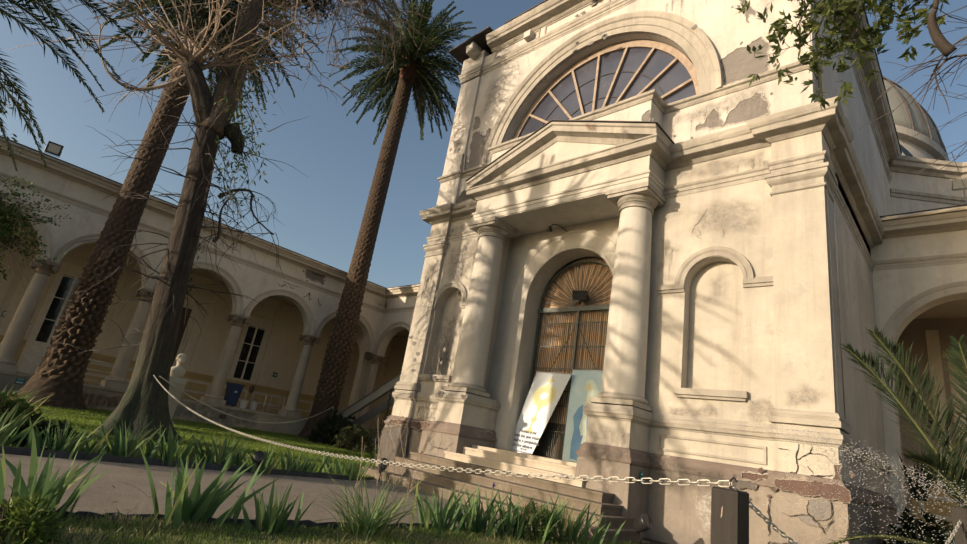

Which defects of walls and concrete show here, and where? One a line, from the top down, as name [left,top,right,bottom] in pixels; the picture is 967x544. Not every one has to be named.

peeling [720,35,780,85]
peeling [690,92,773,139]
peeling [450,116,492,171]
crack [778,445,833,477]
spalling [727,463,856,528]
crack [767,498,850,544]